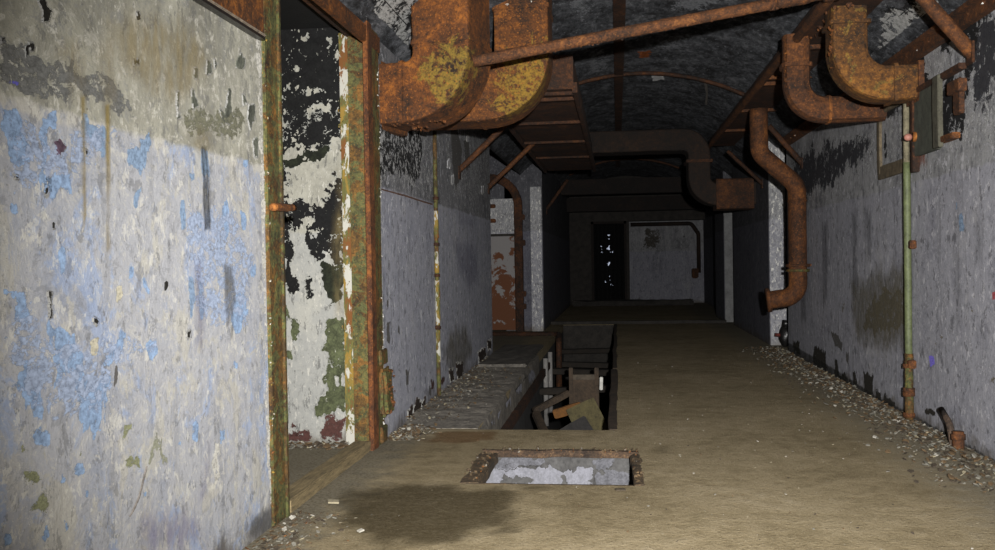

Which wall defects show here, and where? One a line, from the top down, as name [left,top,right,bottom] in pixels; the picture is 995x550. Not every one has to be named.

peeling [0,36,151,214]
peeling [175,40,267,362]
peeling [281,27,344,306]
peeling [3,289,158,446]
peeling [286,305,300,360]
peeling [288,317,349,451]